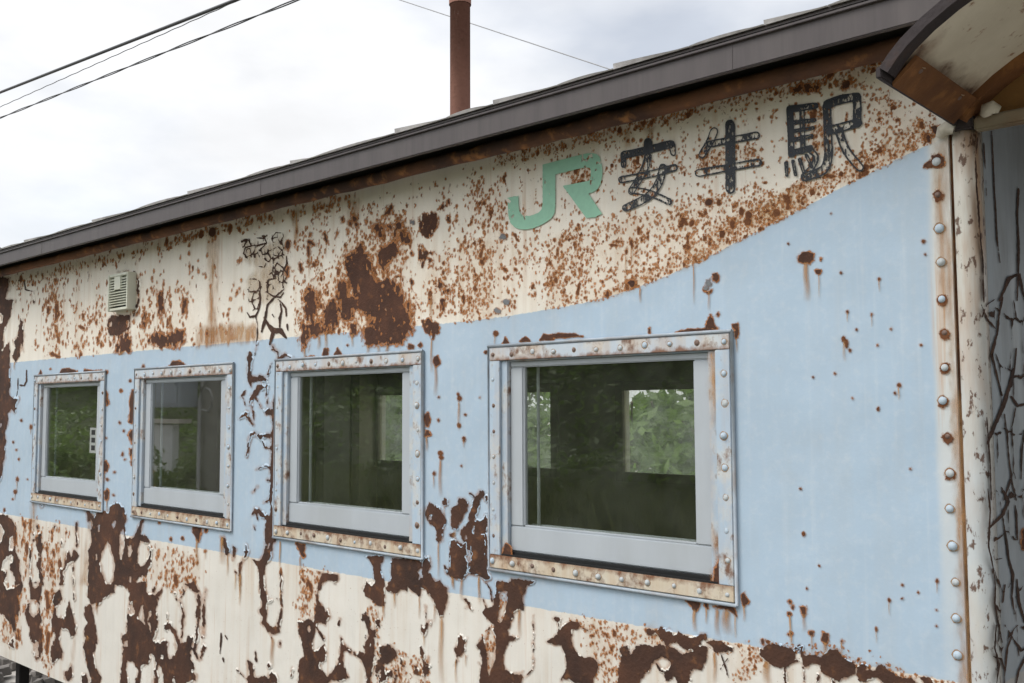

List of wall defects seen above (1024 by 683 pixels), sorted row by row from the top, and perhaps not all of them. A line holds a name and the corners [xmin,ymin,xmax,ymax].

crack [241,232,288,356]
corrosion [11,62,946,379]
peeling [0,501,206,683]
peeling [221,341,598,683]
corrosion [424,411,439,444]
peeling [617,626,734,683]
peeling [759,643,935,683]
crack [975,131,1024,683]